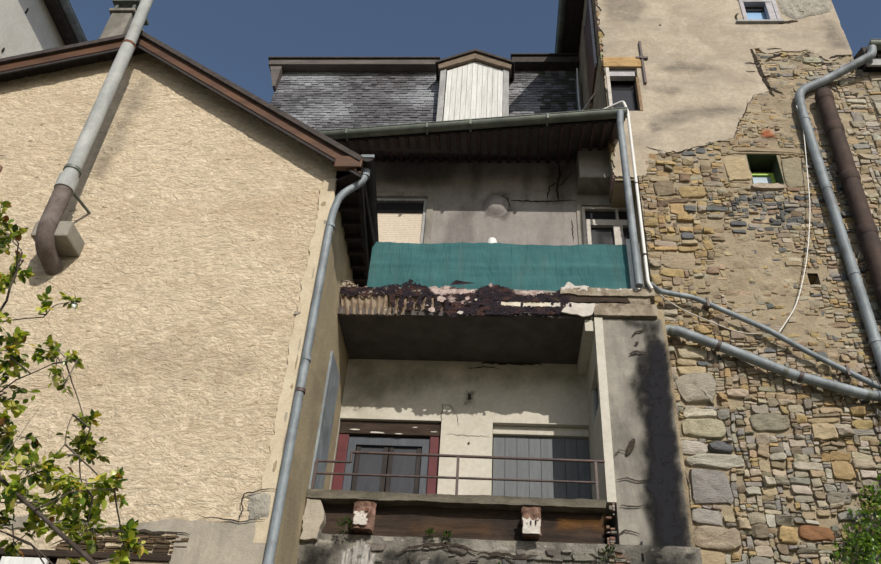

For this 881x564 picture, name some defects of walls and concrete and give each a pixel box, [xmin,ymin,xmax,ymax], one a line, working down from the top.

crack [747,48,846,96]
flaking render [648,95,754,158]
crack [511,163,576,242]
spalling [340,279,595,317]
water stain [626,319,691,564]
flaking render [469,547,547,555]